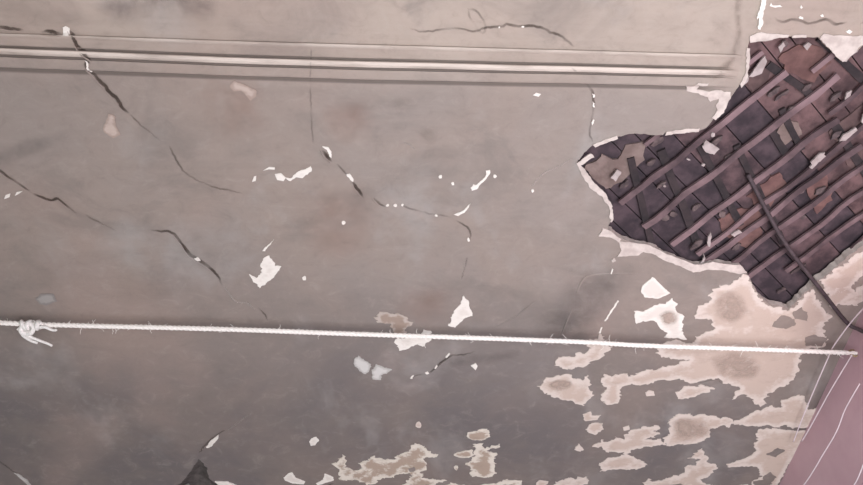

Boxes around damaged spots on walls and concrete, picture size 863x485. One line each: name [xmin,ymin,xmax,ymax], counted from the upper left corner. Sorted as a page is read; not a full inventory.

crack [320,146,332,163]
crack [0,170,76,214]
crack [347,174,404,208]
crack [435,203,471,217]
crack [151,230,222,285]
peeling [249,241,281,288]
spalling [536,0,863,485]
peeling [448,295,472,327]
spalling [178,459,235,485]
peeling [284,472,305,484]
peeling [316,443,458,485]
peeling [454,429,522,485]